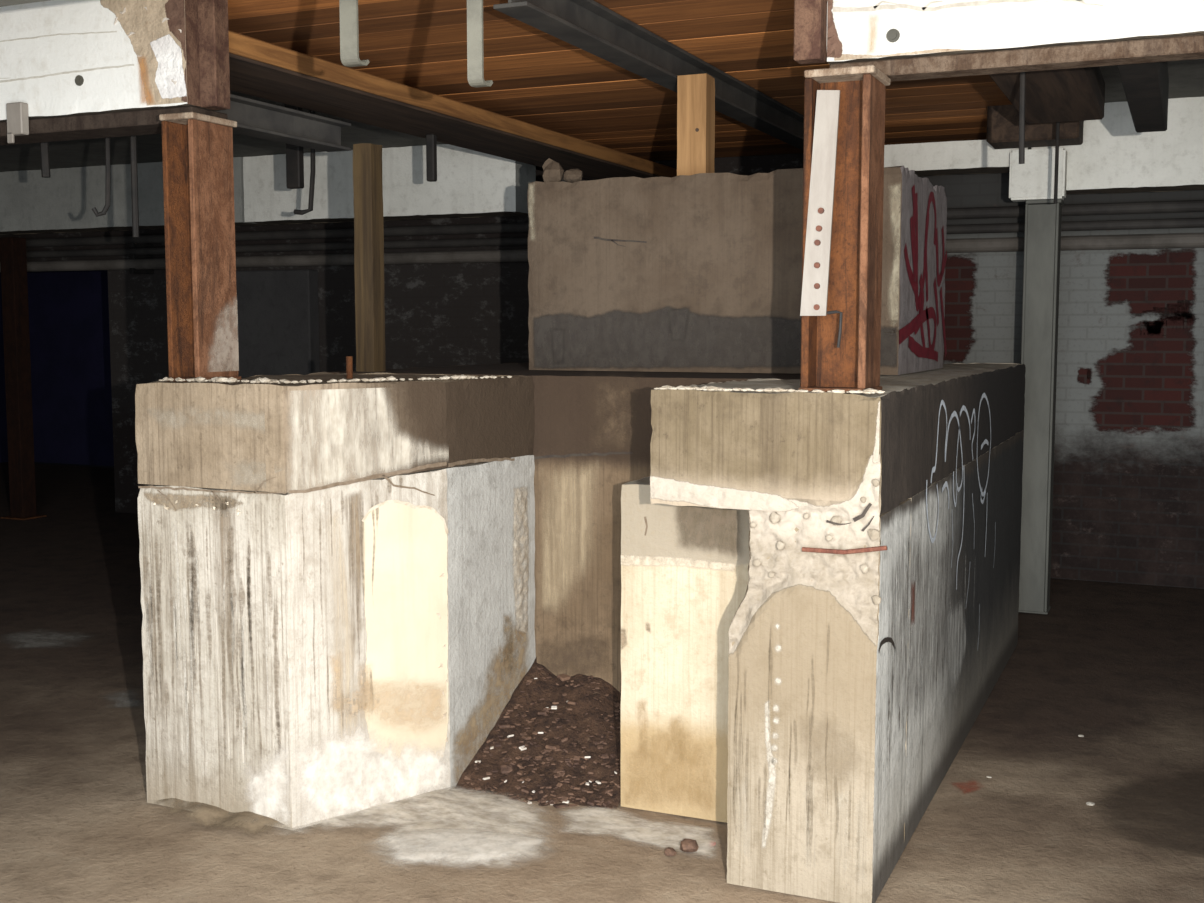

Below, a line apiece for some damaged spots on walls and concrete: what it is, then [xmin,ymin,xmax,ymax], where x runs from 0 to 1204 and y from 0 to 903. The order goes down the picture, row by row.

peeling [100,0,187,105]
spalling [827,0,962,61]
crack [832,0,1103,12]
damp [534,307,801,368]
peeling [943,254,977,364]
peeling [1077,249,1196,433]
damp [173,531,200,752]
damp [216,500,250,763]
damp [336,494,361,741]
spalling [650,401,887,654]